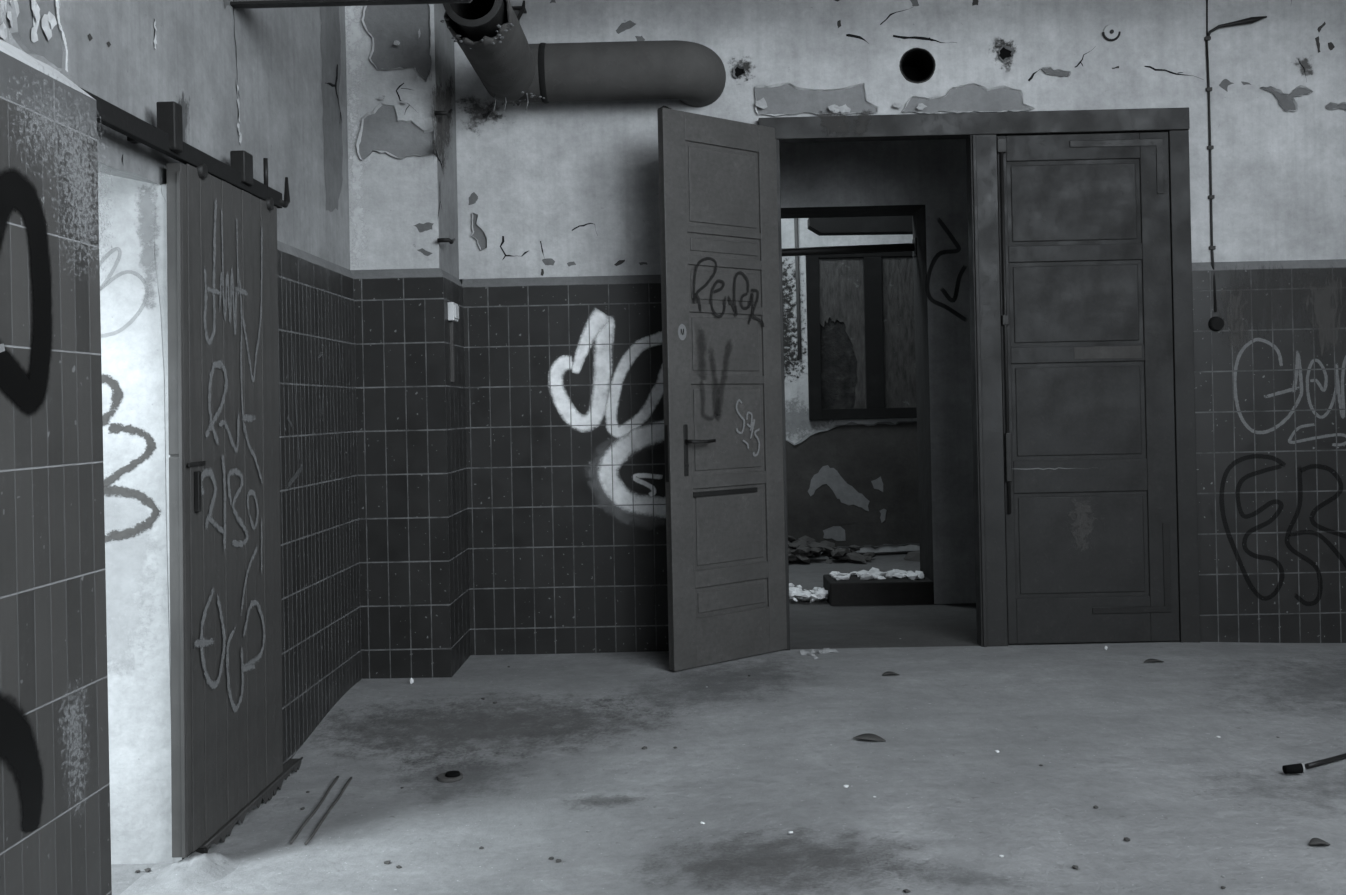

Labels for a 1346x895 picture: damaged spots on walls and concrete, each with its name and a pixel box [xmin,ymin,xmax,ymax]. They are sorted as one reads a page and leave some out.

spalling [0,0,68,72]
spalling [356,95,434,160]
spalling [361,4,432,81]
spalling [731,39,1035,116]
spalling [1219,79,1313,111]
peeling [786,421,920,549]